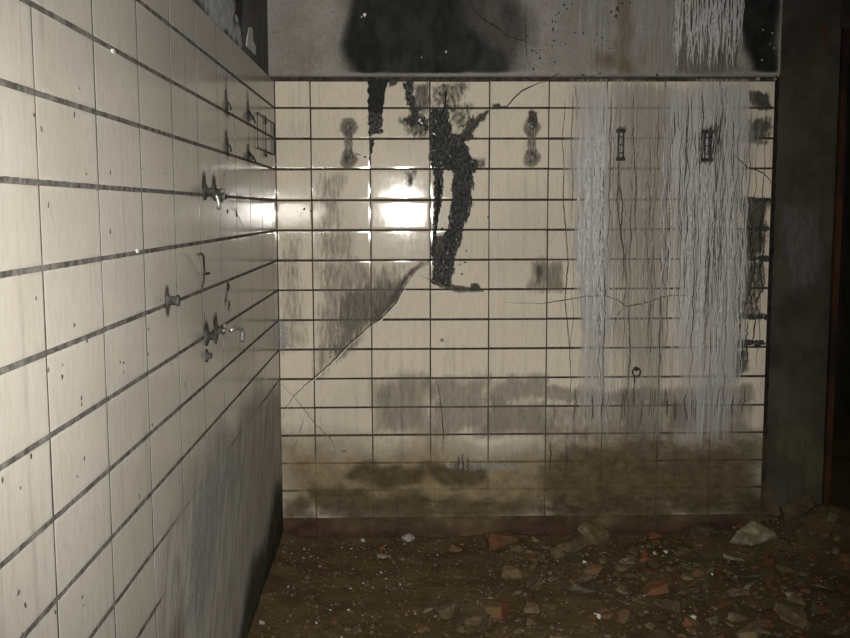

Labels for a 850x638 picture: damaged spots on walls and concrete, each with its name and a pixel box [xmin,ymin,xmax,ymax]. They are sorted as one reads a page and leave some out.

crack [281,264,448,500]
crack [536,294,706,325]
leakage [533,0,779,437]
crack [733,153,772,184]
leakage [162,390,283,638]